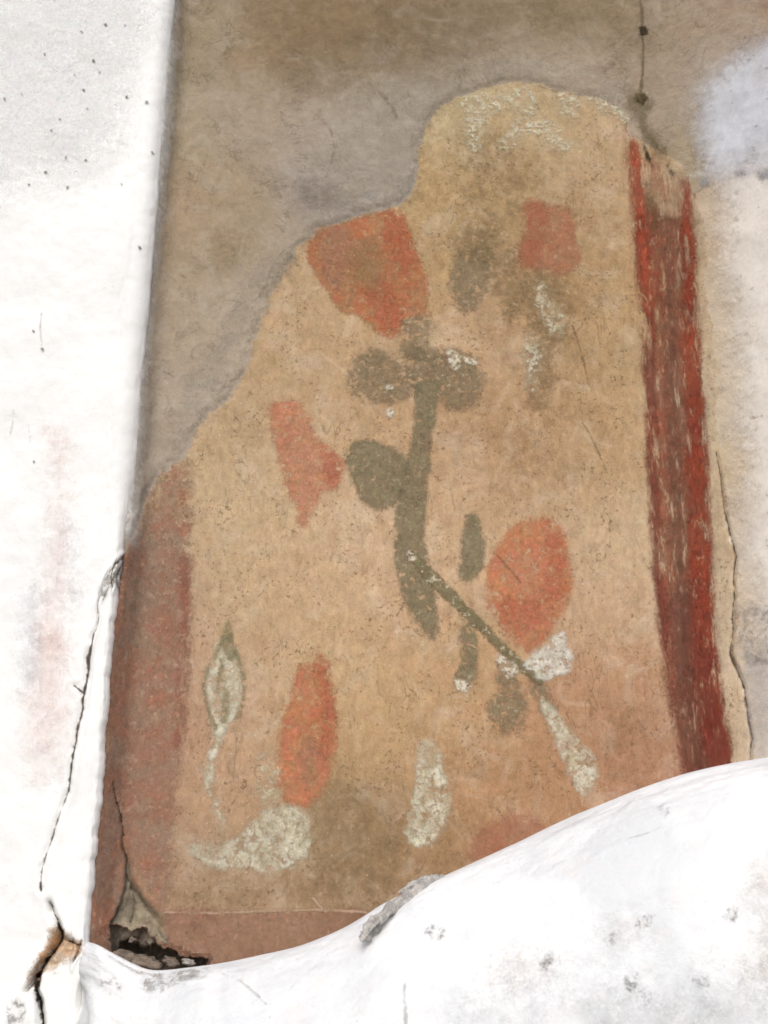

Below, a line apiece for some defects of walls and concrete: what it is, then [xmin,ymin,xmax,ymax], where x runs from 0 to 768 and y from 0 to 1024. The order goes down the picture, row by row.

peeling [461,87,570,152]
peeling [446,350,477,370]
crack [716,452,753,755]
crack [30,557,124,1024]
crack [109,787,134,924]
spalling [91,863,167,943]